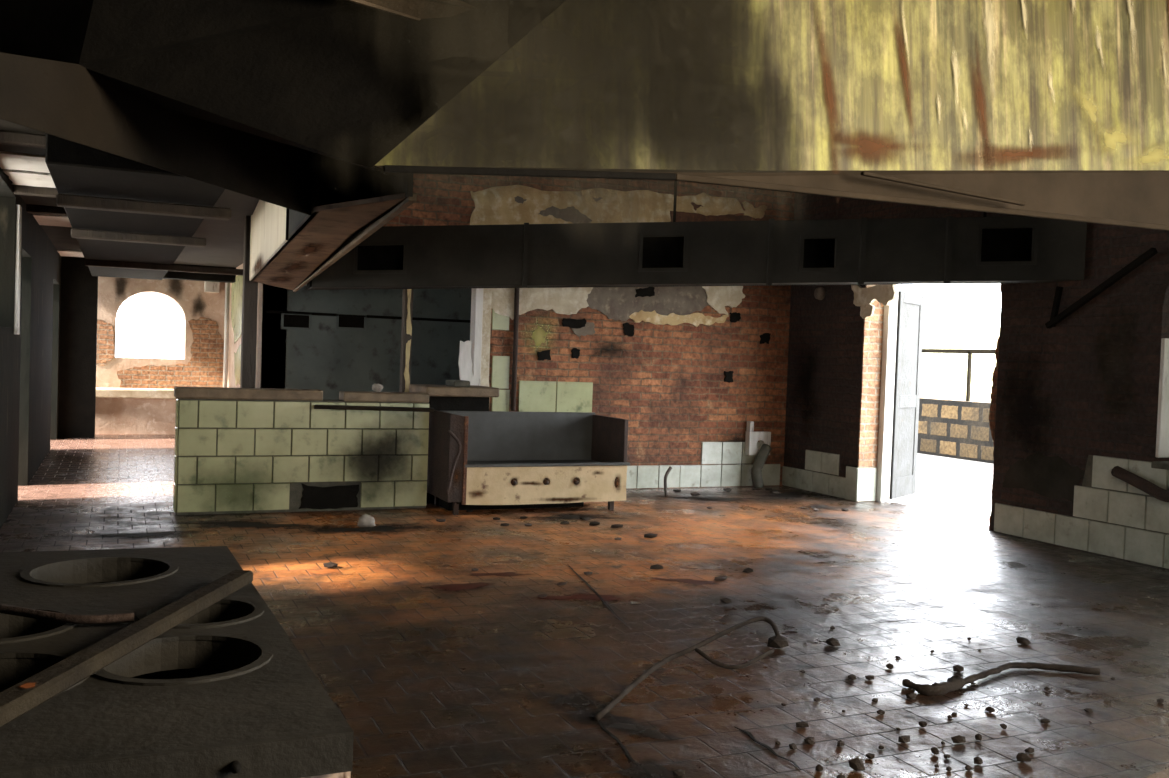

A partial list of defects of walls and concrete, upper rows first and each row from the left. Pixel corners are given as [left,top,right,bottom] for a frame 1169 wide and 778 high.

corrosion [820,37,901,169]
corrosion [896,24,912,125]
corrosion [973,65,1063,165]
peeling [481,286,745,403]